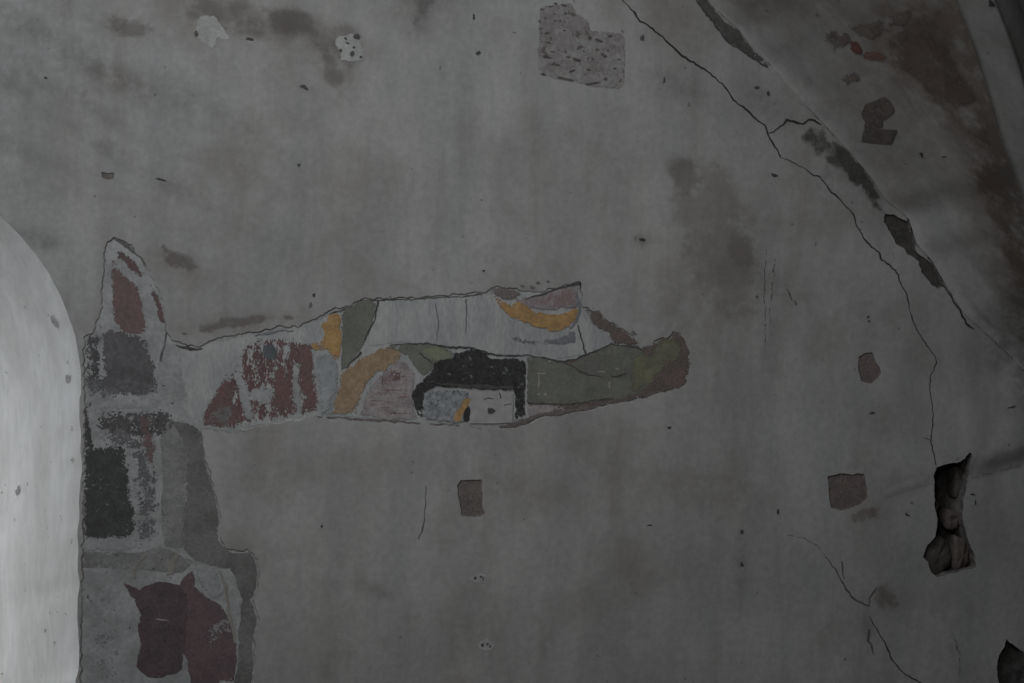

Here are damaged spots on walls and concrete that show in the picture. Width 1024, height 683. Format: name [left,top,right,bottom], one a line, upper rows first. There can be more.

spalling [696,0,770,68]
spalling [861,97,897,145]
water stain [834,143,879,198]
crack [622,0,937,465]
spalling [884,214,944,289]
crack [941,283,974,329]
spalling [858,352,881,384]
peeling [79,237,691,683]
spalling [827,473,868,511]
spalling [923,453,976,577]
crack [790,535,921,683]
spalling [997,639,1024,683]